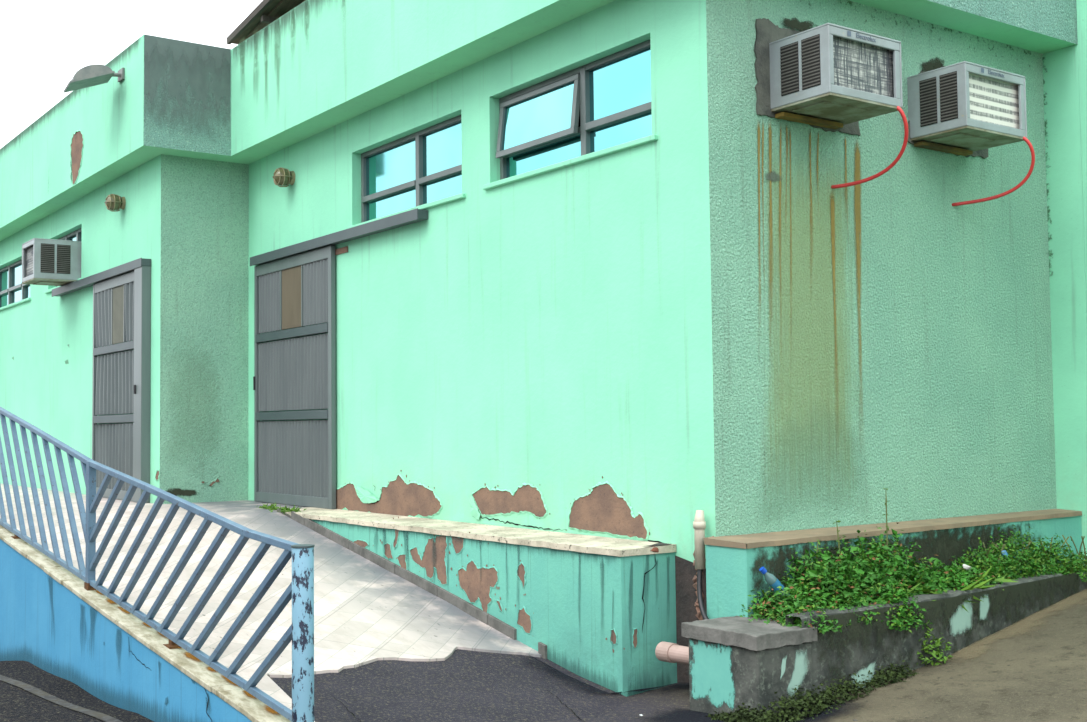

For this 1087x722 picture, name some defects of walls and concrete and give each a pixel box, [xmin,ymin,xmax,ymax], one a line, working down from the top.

rust [758,125,792,289]
rust [809,133,819,233]
rust [831,139,861,369]
peeling [336,470,532,635]
peeling [469,483,550,520]
peeling [568,476,735,710]
peeling [780,652,807,695]